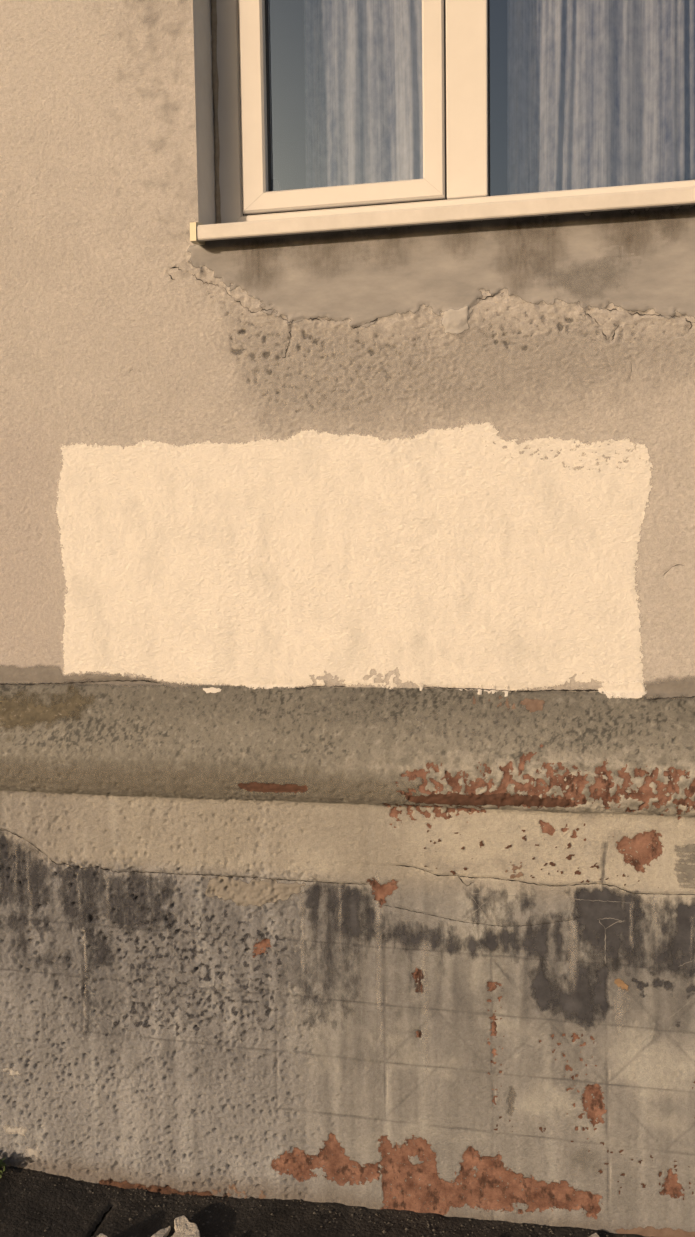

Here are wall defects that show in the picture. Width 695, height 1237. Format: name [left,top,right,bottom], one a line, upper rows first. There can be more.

flaking render [239,324,397,412]
flaking render [485,308,572,351]
crack [1,830,361,885]
peeling [238,782,307,793]
peeling [383,744,695,886]
crack [396,865,695,895]
water stain [0,835,287,1041]
water stain [302,855,695,1027]
peeling [487,981,516,1132]
peeling [539,1033,694,1200]
peeling [271,1133,603,1219]